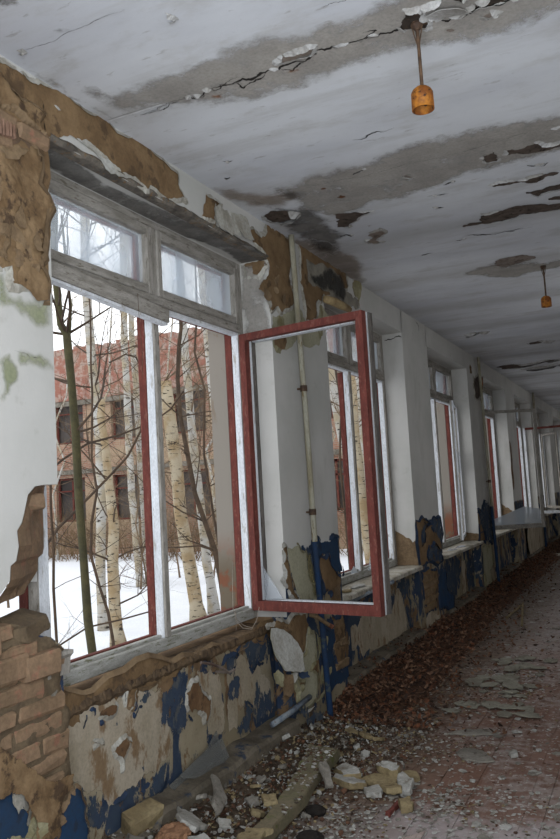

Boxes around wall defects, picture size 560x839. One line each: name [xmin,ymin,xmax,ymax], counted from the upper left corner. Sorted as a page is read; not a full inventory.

crack [428,0,518,22]
crack [143,27,401,115]
spalling [272,44,318,66]
spalling [479,140,560,164]
flaking render [0,57,362,321]
spalling [463,172,560,227]
spalling [494,255,536,268]
spalling [496,358,560,371]
spalling [0,485,46,604]
peeling [461,512,495,594]
peeling [0,588,407,807]
peeling [12,793,25,814]